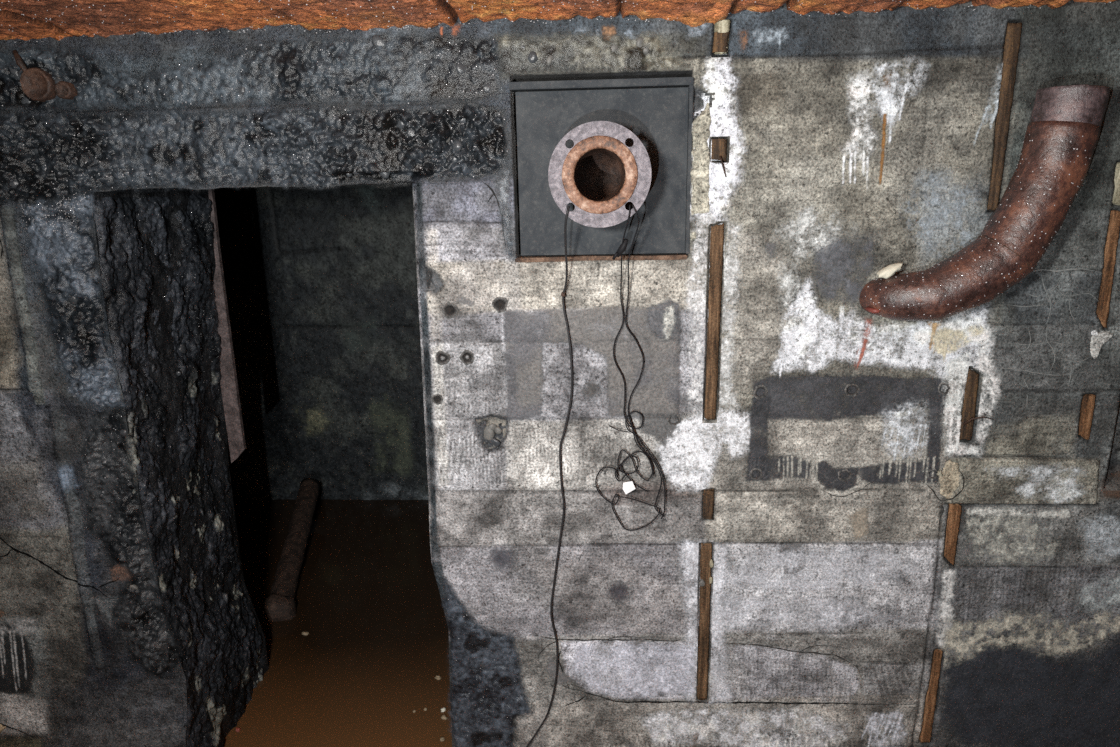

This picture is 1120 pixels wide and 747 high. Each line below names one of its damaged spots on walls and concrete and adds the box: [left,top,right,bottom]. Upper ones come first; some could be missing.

damp [842,64,923,183]
damp [974,75,1002,144]
damp [905,173,975,256]
damp [639,57,751,491]
rust [857,320,871,367]
damp [774,208,1000,460]
crack [0,537,121,599]
crack [530,634,912,747]
damp [574,540,895,747]
damp [862,712,906,747]
damp [937,570,1120,747]